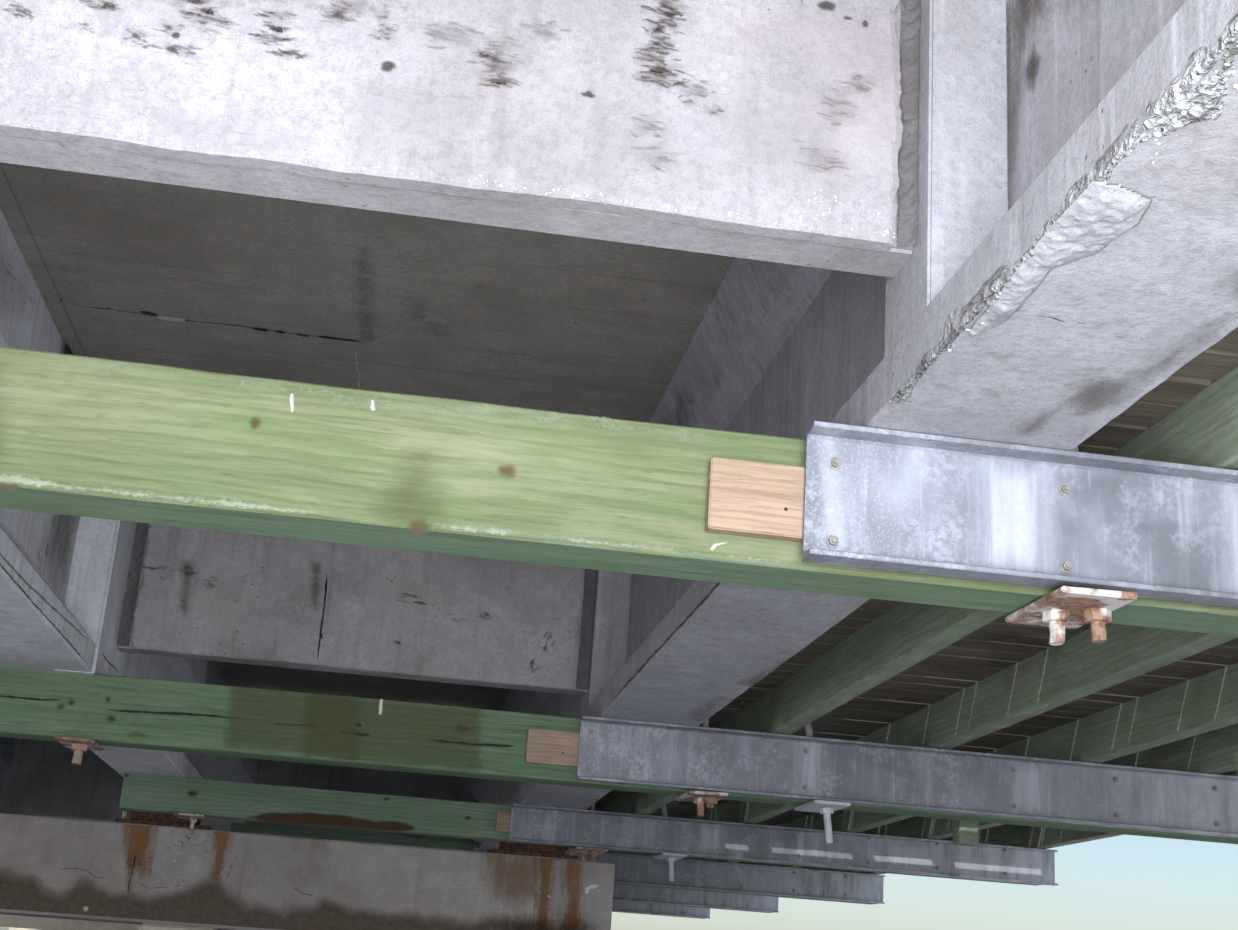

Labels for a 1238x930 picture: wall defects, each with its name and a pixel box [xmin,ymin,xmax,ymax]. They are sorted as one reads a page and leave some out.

spalling [889,14,1238,405]
crack [60,298,359,342]
crack [317,574,327,660]
rust [125,824,153,875]
rust [213,832,234,874]
damp [0,868,591,930]
rust [536,858,580,930]